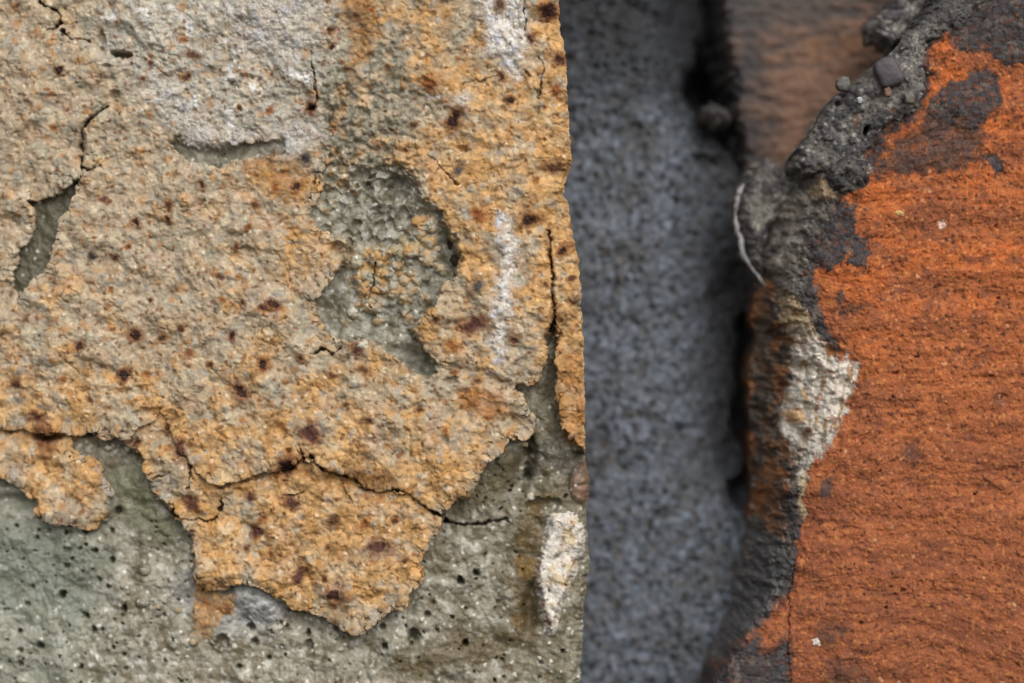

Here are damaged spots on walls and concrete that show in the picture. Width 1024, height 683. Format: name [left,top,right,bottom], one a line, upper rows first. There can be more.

spalling [170,135,286,168]
crack [548,233,556,332]
spalling [0,159,590,683]
leakage [774,289,860,516]
crack [171,465,224,523]
crack [297,451,507,526]